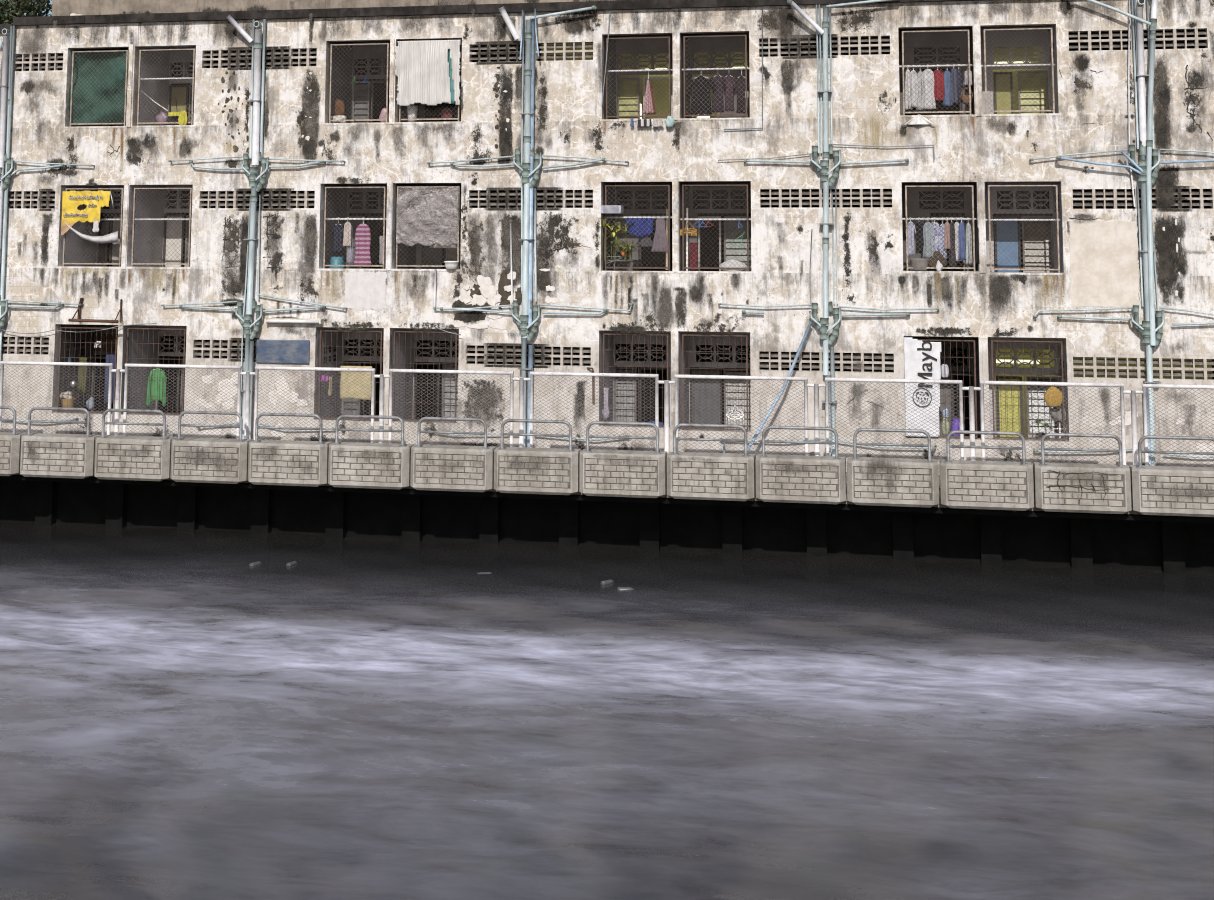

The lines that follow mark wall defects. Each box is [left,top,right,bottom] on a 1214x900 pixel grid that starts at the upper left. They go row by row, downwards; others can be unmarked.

leakage [543,0,618,84]
leakage [124,133,159,166]
leakage [180,138,199,157]
leakage [202,6,290,168]
leakage [296,70,369,185]
leakage [375,127,404,158]
leakage [1153,33,1214,305]
leakage [221,188,378,362]
flaking render [450,270,522,330]
flaking render [539,269,559,304]
leakage [399,16,748,450]
spalling [469,345,591,365]